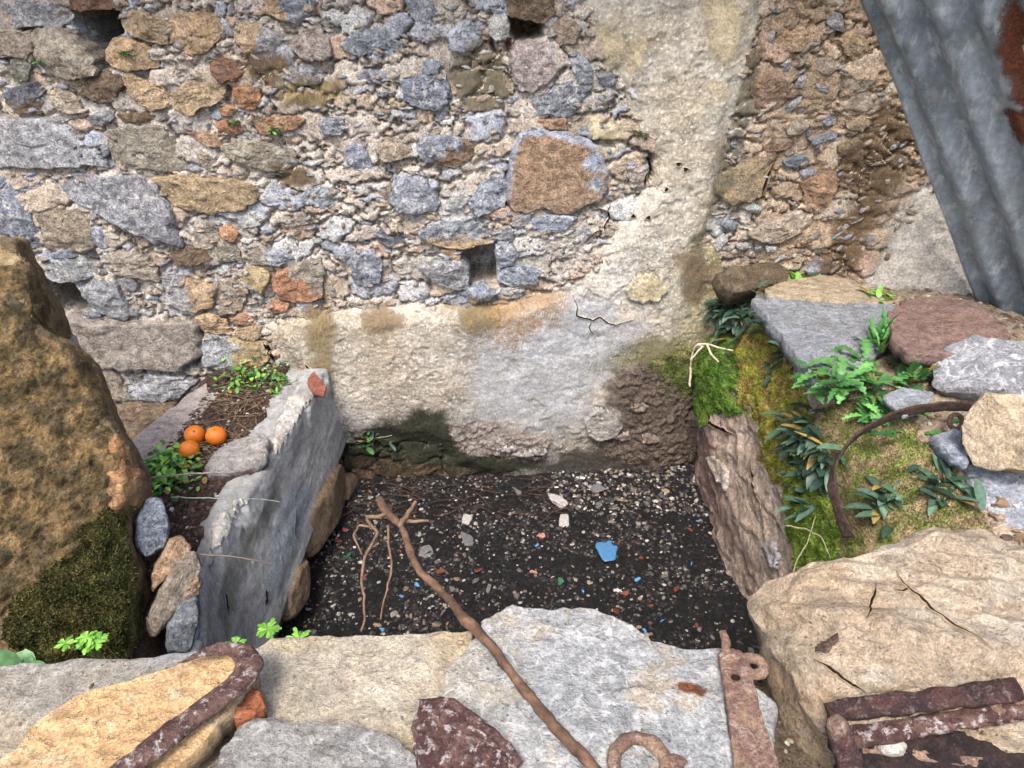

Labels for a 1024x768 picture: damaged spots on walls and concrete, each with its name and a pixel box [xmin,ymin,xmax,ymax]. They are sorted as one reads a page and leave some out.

corrosion [994,0,1024,144]
crack [573,296,633,334]
damp [339,457,472,479]